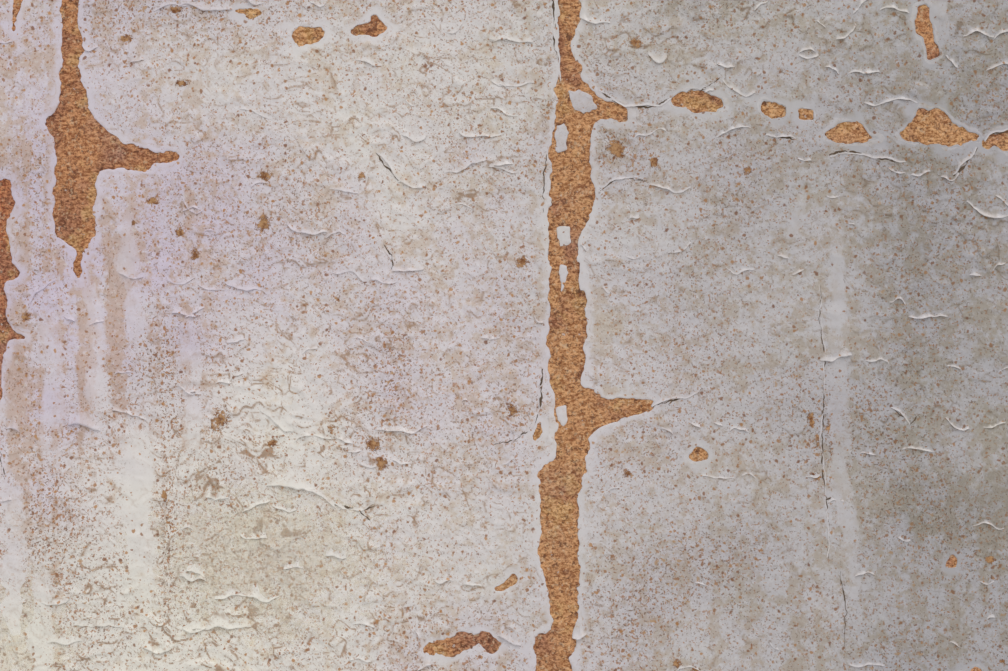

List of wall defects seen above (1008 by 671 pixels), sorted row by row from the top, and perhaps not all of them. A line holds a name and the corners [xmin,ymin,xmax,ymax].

peeling [291,24,332,53]
peeling [346,14,393,66]
peeling [880,0,958,68]
peeling [668,56,816,121]
peeling [822,93,1008,156]
peeling [888,165,959,181]
peeling [0,0,182,400]
peeling [967,194,1008,218]
peeling [526,0,667,671]
peeling [494,571,520,594]
peeling [415,626,503,671]